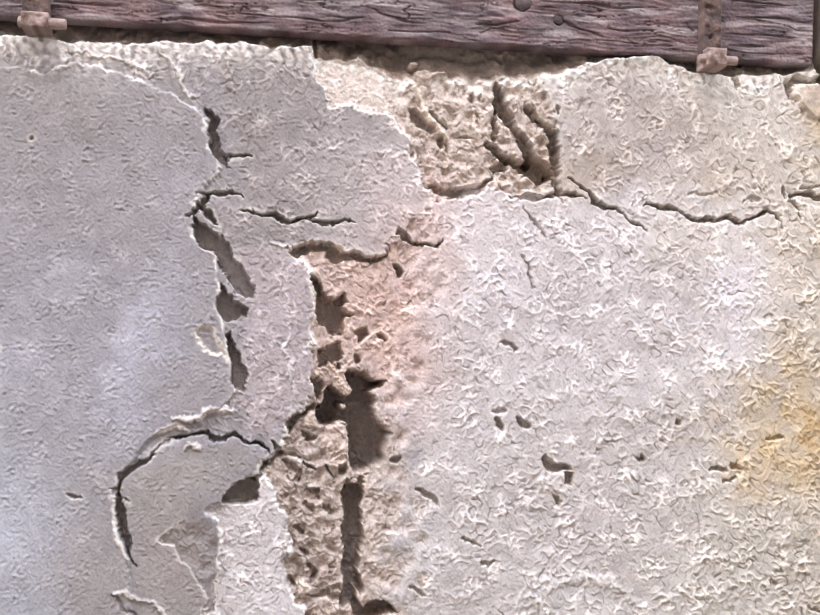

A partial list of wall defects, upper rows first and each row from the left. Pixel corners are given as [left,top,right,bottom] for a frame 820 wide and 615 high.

spalling [311,50,558,204]
crack [420,80,820,243]
crack [519,254,536,291]
spalling [263,213,446,615]
crack [111,594,139,615]
crack [108,429,271,567]
spalling [460,535,482,547]